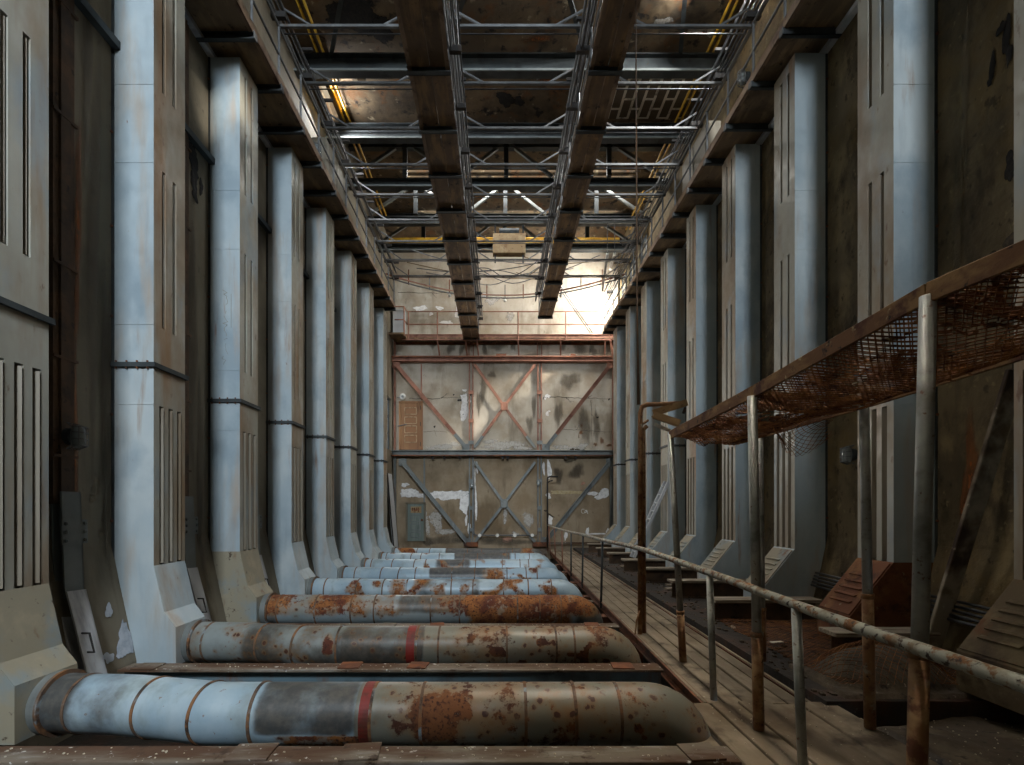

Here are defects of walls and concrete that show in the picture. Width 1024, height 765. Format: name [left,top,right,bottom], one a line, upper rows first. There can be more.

peeling [460,389,471,421]
water stain [562,375,577,387]
water stain [554,413,599,481]
peeling [400,463,478,535]
peeling [542,460,609,525]
peeling [103,602,134,664]